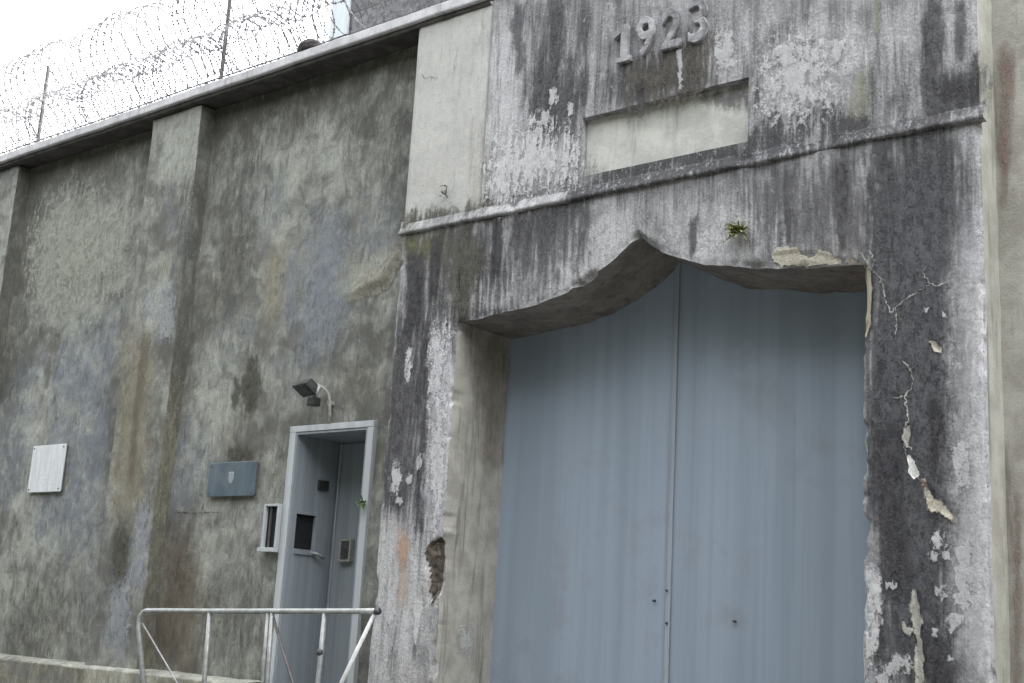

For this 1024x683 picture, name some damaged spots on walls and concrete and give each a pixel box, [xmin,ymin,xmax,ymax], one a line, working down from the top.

water stain [510,0,589,148]
water stain [920,0,993,117]
peeling [480,87,586,218]
water stain [688,214,698,257]
spalling [770,246,873,338]
crack [862,251,948,338]
water stain [385,164,598,544]
water stain [748,126,974,683]
peeling [391,453,422,506]
peeling [866,254,993,683]
spalling [410,537,445,645]